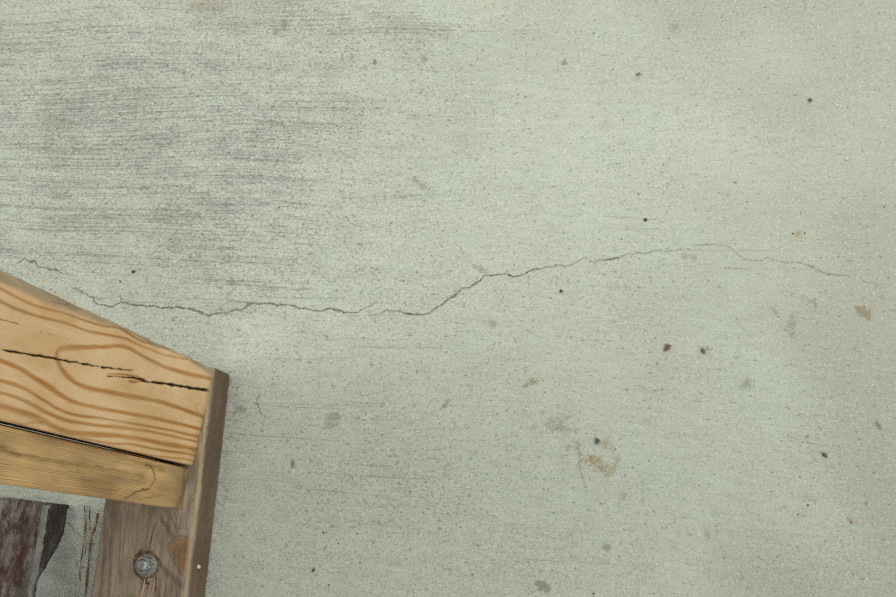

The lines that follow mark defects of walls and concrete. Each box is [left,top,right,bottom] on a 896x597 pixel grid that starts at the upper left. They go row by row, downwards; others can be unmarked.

crack [16,244,847,327]